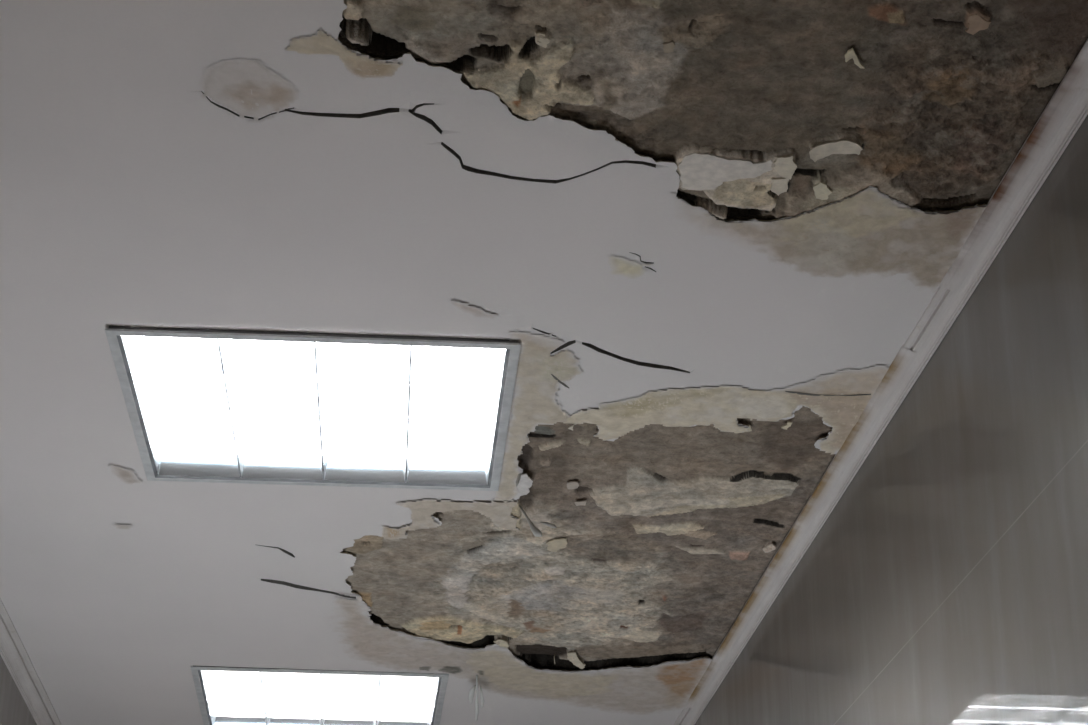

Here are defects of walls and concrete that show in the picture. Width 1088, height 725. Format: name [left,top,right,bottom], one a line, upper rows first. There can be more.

crack [201,91,656,184]
spalling [285,0,1088,220]
damp [669,188,986,293]
crack [533,328,690,388]
crack [259,545,356,599]
spalling [342,330,872,670]
damp [325,346,916,715]